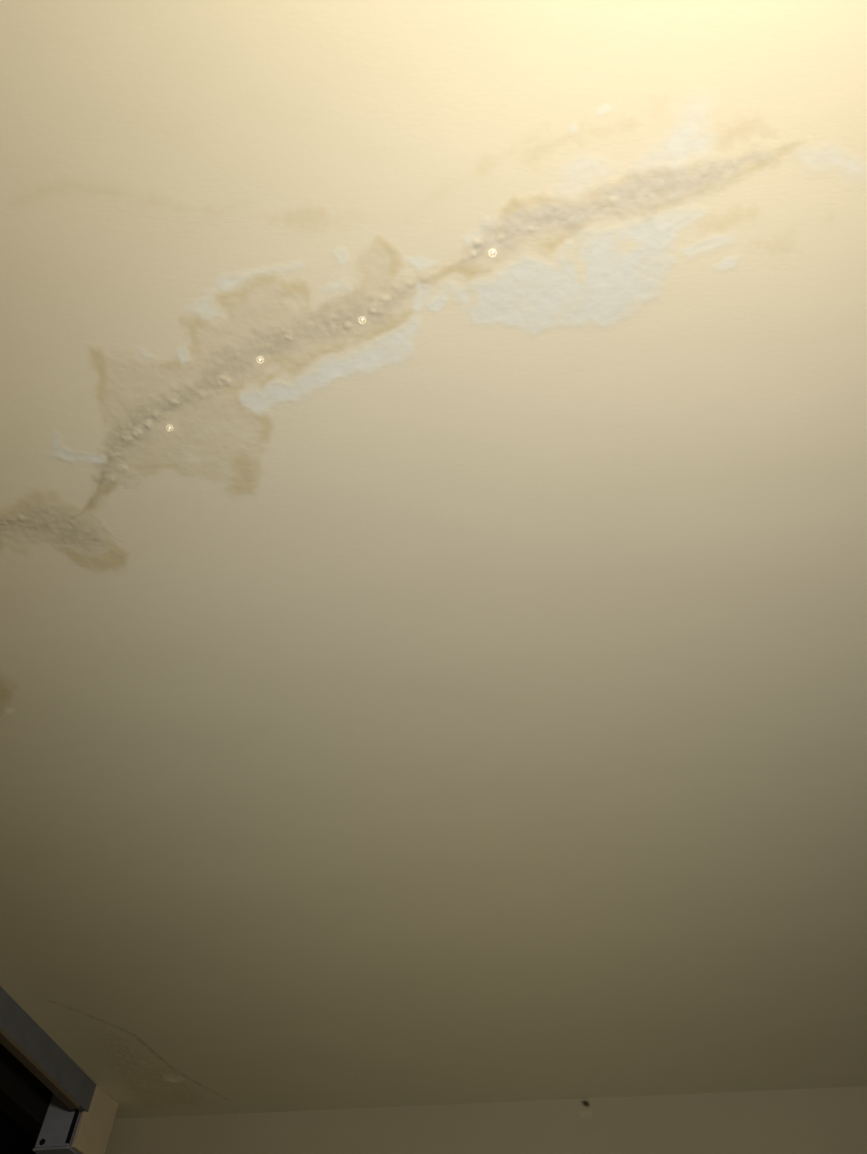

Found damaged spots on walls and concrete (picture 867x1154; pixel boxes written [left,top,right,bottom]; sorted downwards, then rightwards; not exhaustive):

peeling [546,75,732,203]
damp [0,86,807,576]
peeling [233,200,745,419]